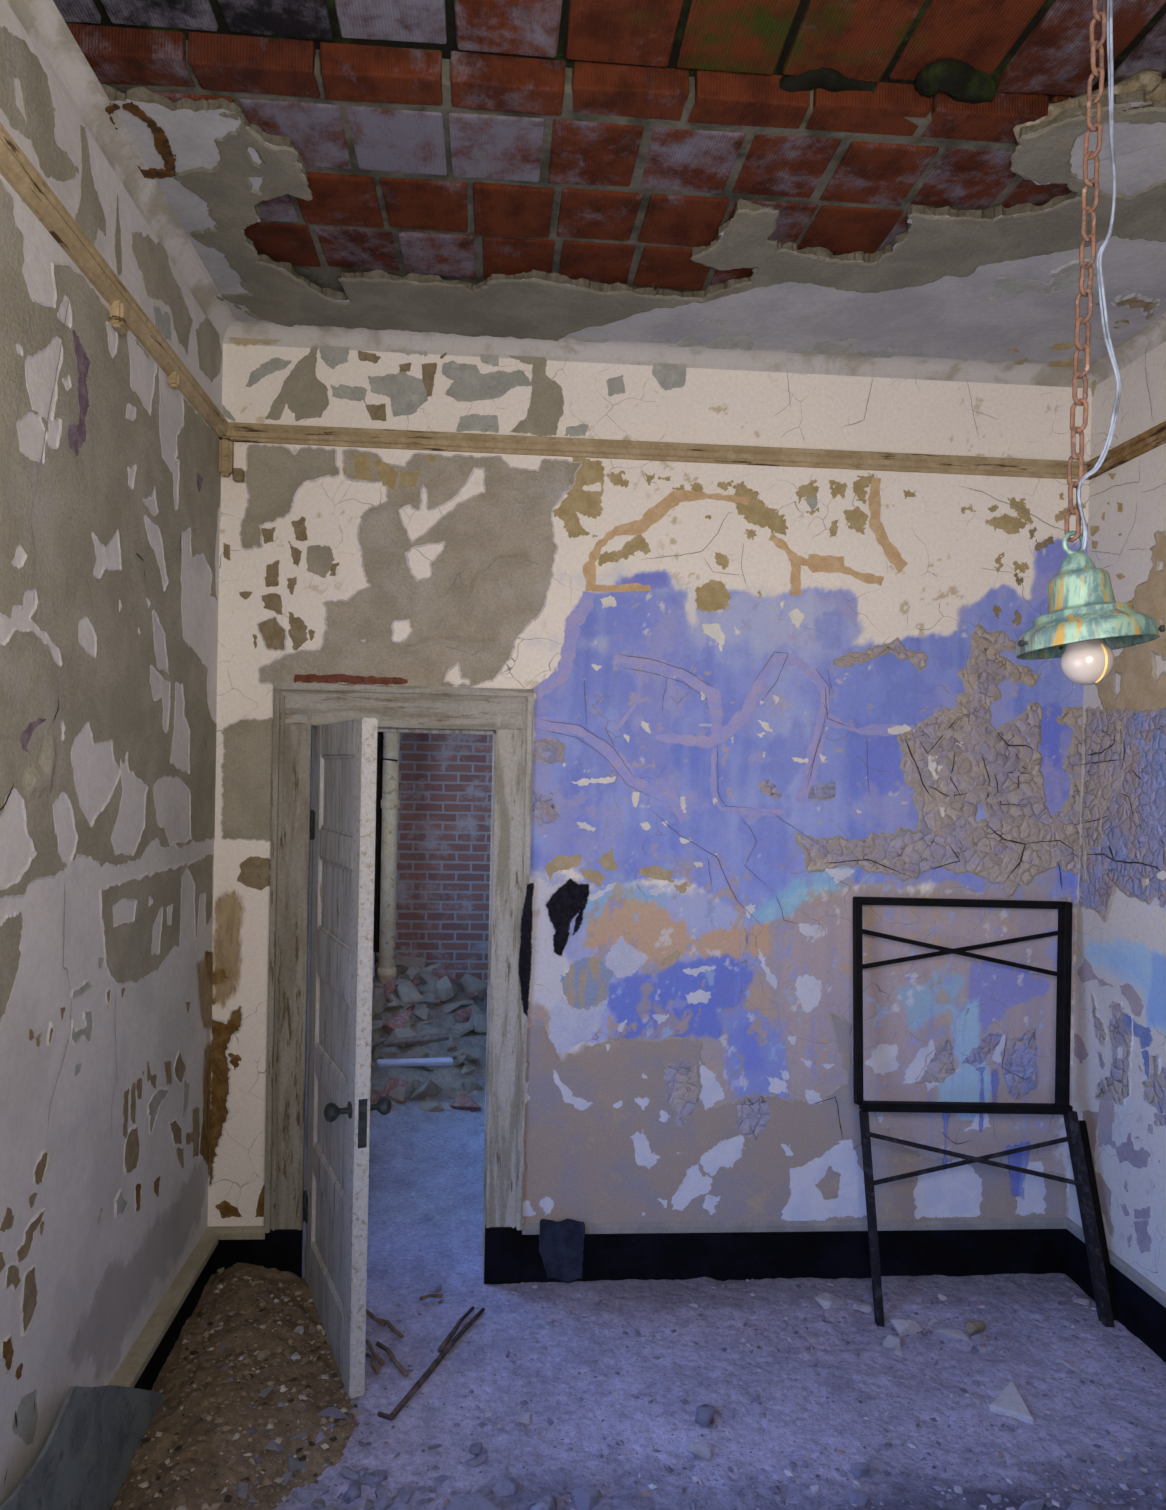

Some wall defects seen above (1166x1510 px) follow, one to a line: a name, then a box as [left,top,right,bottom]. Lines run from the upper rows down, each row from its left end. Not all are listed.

peeling [0,26,222,382]
spalling [53,0,1166,437]
peeling [0,179,874,1223]
peeling [833,637,928,671]
spalling [887,724,915,735]
spalling [928,756,943,779]
peeling [993,605,1022,625]
peeling [961,492,1123,585]
peeling [1095,530,1166,713]
peeling [522,936,1068,1224]
peeling [1074,959,1166,1254]
peeling [0,1149,49,1445]